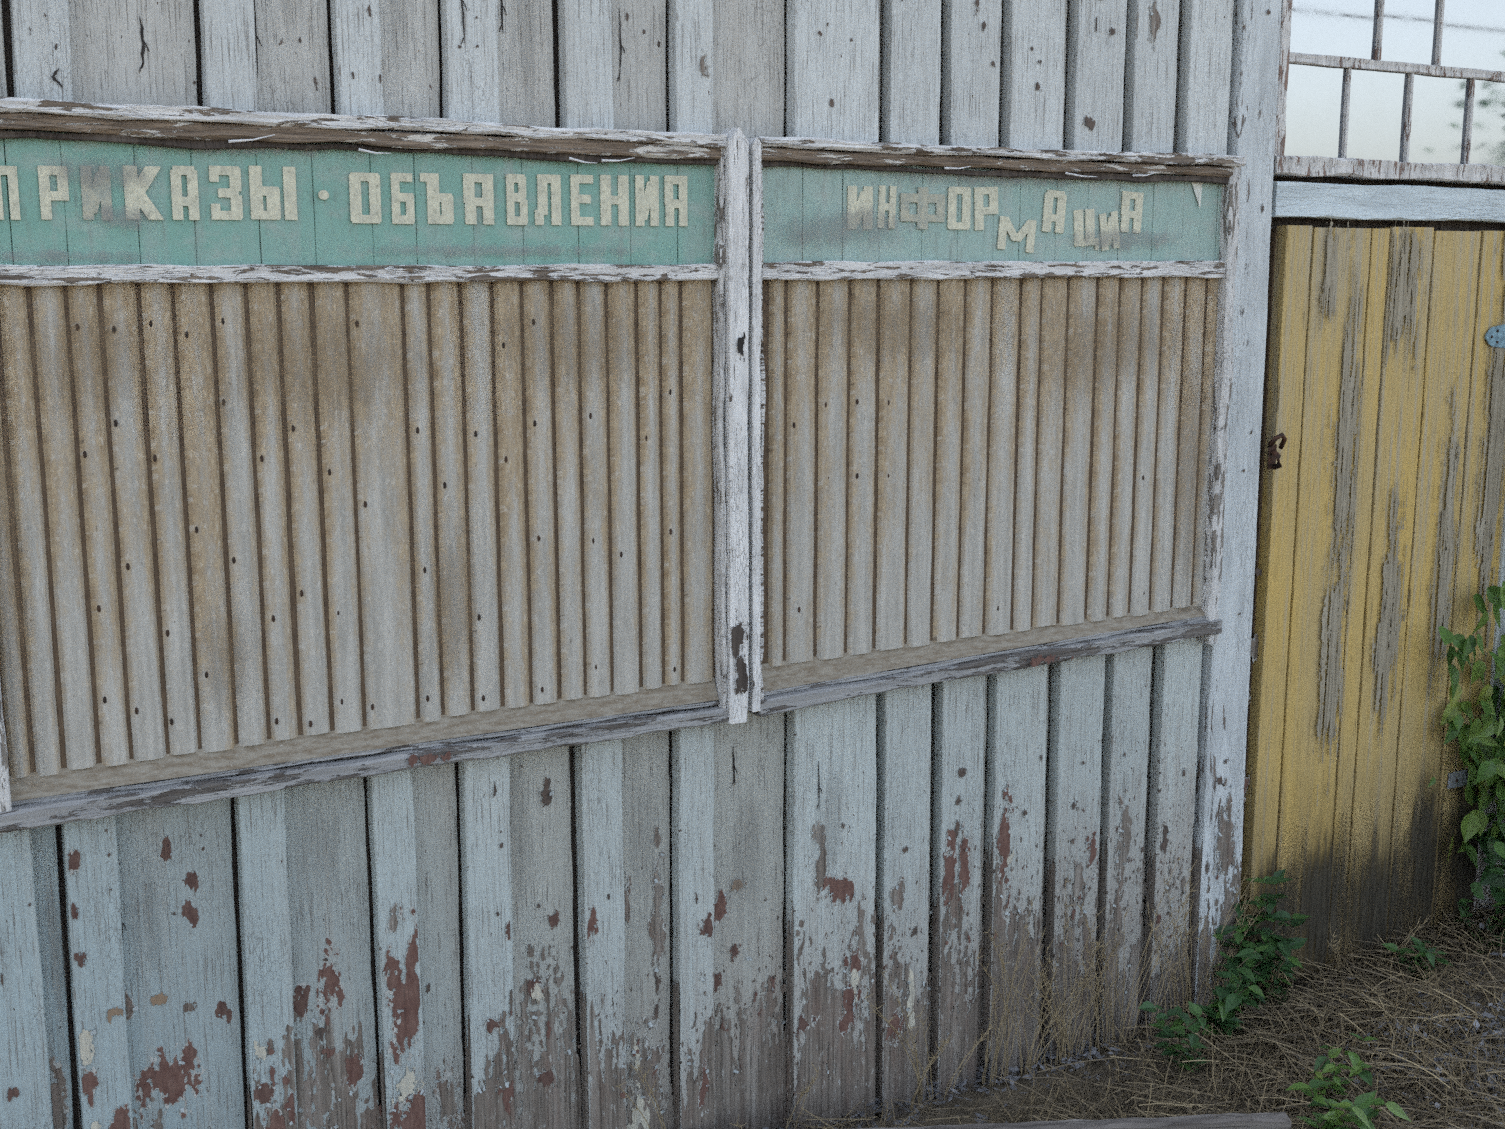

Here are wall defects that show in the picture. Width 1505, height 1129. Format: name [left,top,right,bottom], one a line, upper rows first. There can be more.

peeling [731,622,749,695]
peeling [408,751,451,768]
peeling [68,846,81,876]
peeling [160,836,173,861]
peeling [171,871,199,928]
damp [1252,770,1480,989]
peeling [74,952,88,968]
peeling [247,757,1250,1129]
peeling [49,981,239,1129]
peeling [7,1087,20,1102]